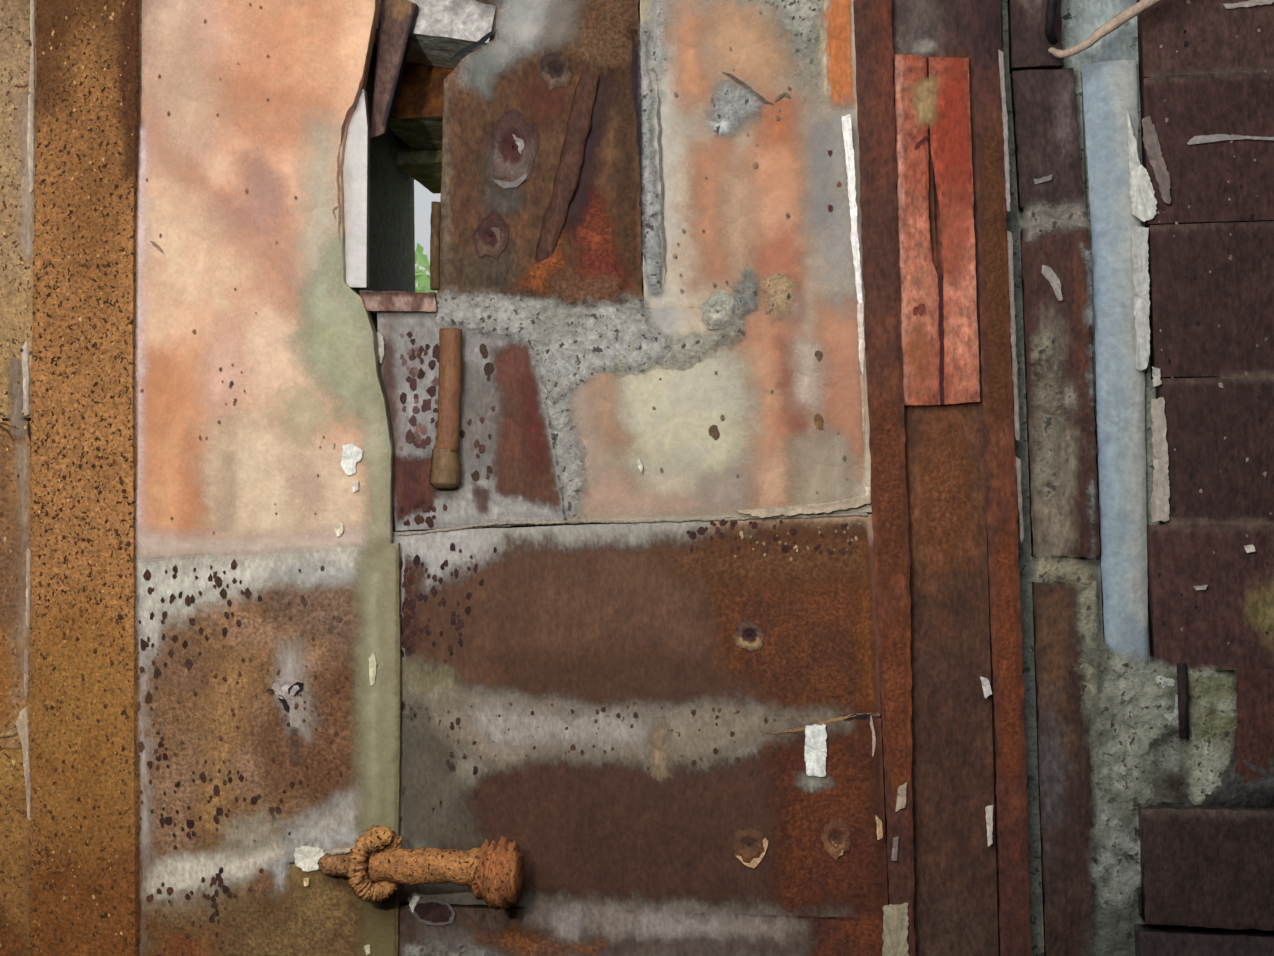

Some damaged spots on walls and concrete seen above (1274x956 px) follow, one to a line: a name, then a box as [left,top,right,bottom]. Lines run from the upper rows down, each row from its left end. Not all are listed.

corrosion [502,185,630,306]
corrosion [666,0,864,508]
crack [0,419,31,465]
corrosion [383,343,395,421]
corrosion [393,456,439,520]
water stain [137,126,854,956]
corrosion [463,342,559,512]
corrosion [581,378,637,490]
corrosion [32,631,128,849]
corrosion [144,579,364,860]
corrosion [405,524,884,956]